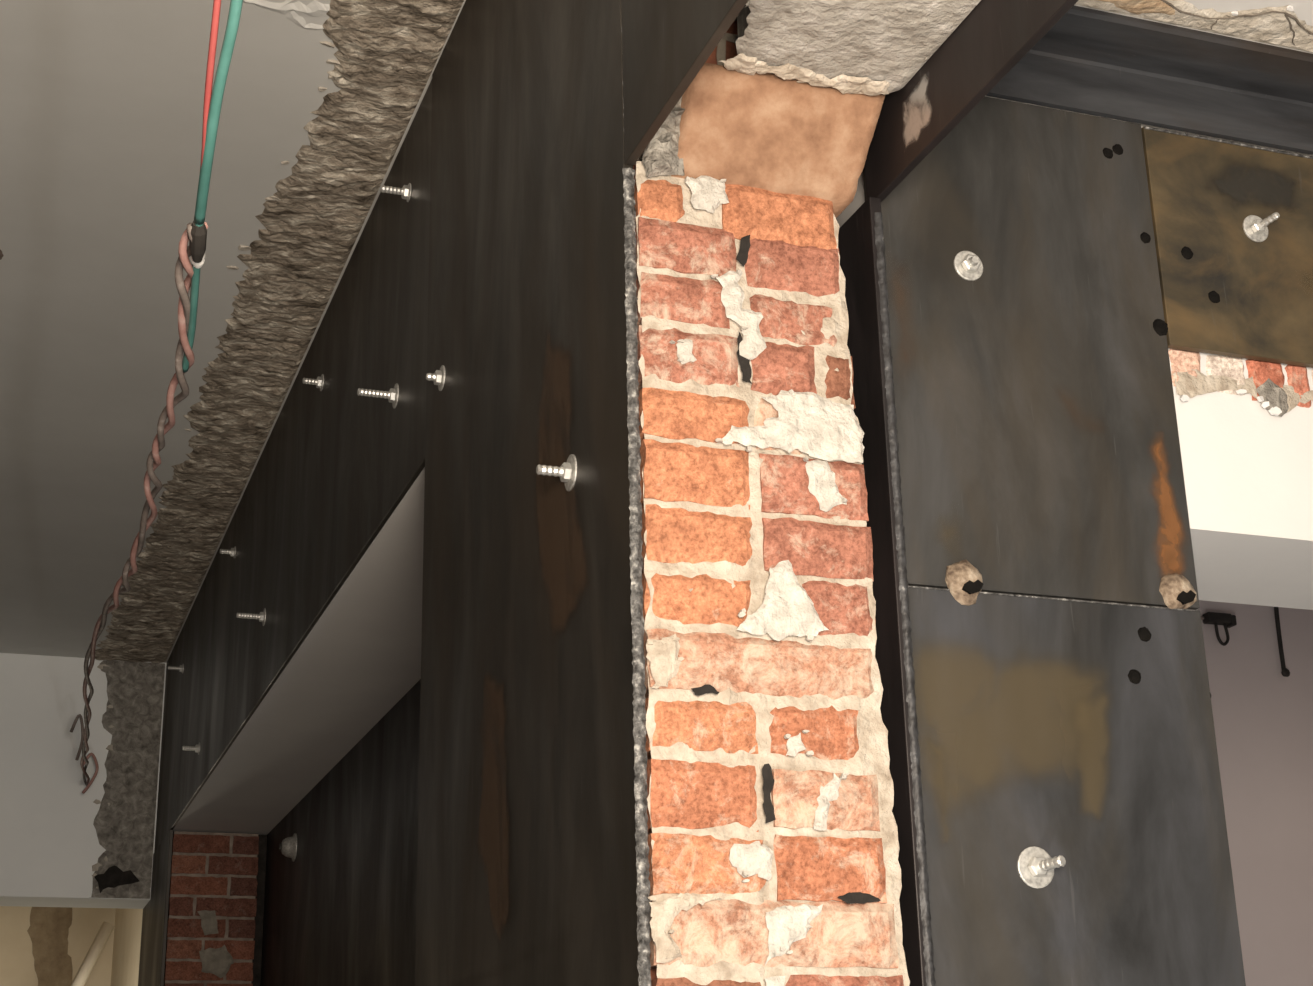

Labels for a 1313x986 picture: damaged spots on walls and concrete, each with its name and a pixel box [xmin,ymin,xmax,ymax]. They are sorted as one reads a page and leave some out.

crack [1161,0,1313,45]
flaking render [1168,348,1313,417]
flaking render [89,0,464,899]
rust [1154,442,1182,575]
flaking render [27,907,73,986]